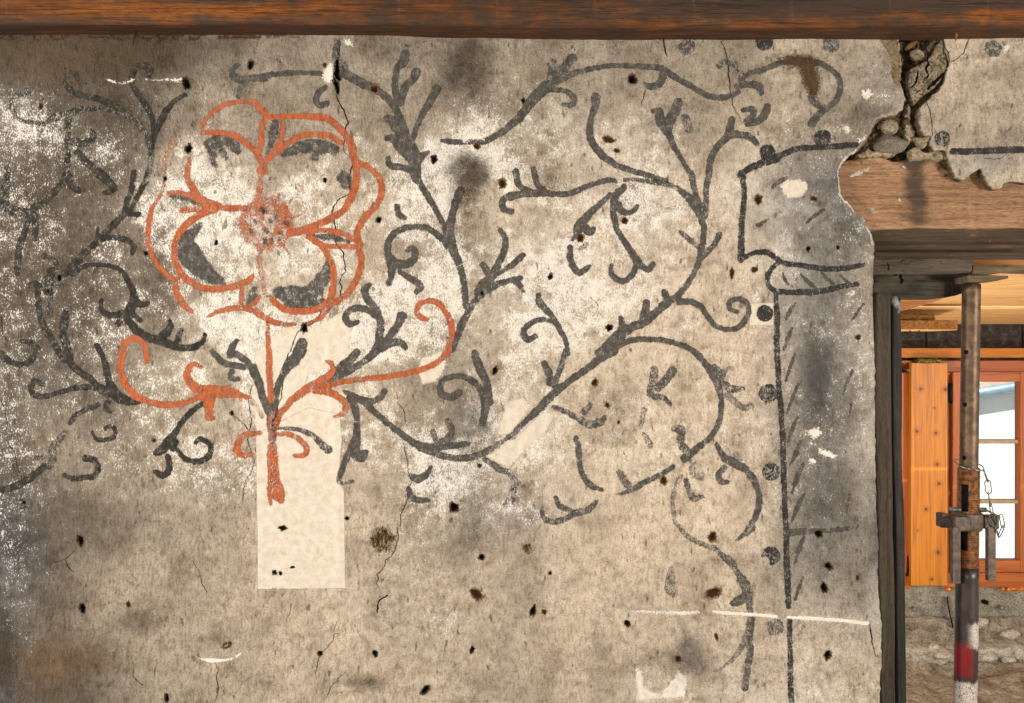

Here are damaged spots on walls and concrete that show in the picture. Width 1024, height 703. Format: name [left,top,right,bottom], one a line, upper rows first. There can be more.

flaking render [881,40,901,86]
flaking render [837,125,866,212]
spalling [885,115,930,149]
crack [279,39,356,402]
crack [376,396,412,612]